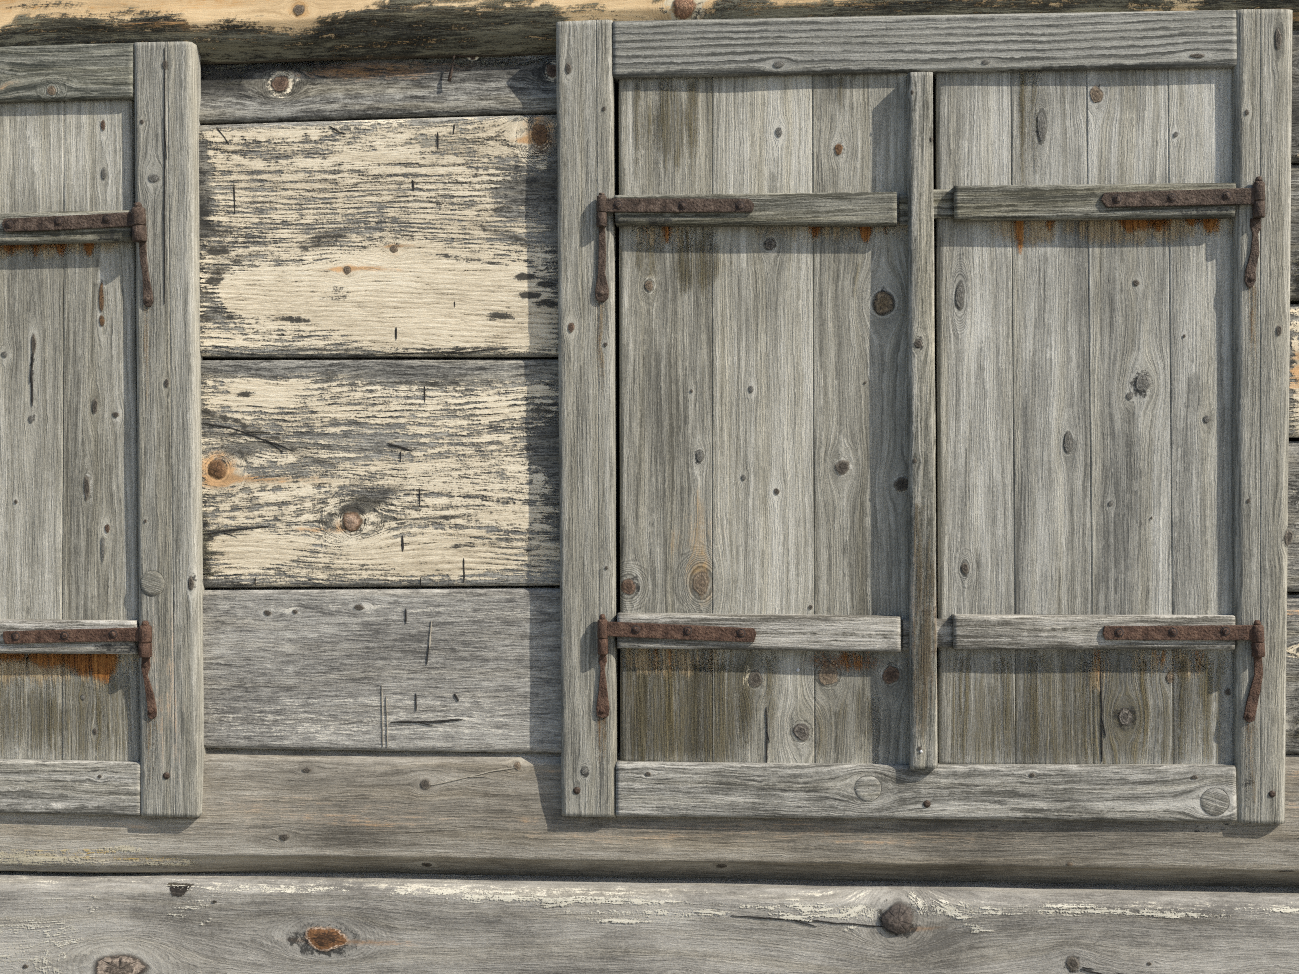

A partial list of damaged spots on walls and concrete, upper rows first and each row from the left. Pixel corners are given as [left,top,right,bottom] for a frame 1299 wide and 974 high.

rust [0,243,118,259]
peeling [199,115,558,356]
rust [784,227,877,242]
rust [991,219,1233,253]
peeling [1289,309,1299,437]
peeling [201,373,560,587]
rust [0,653,138,686]
rust [626,649,717,675]